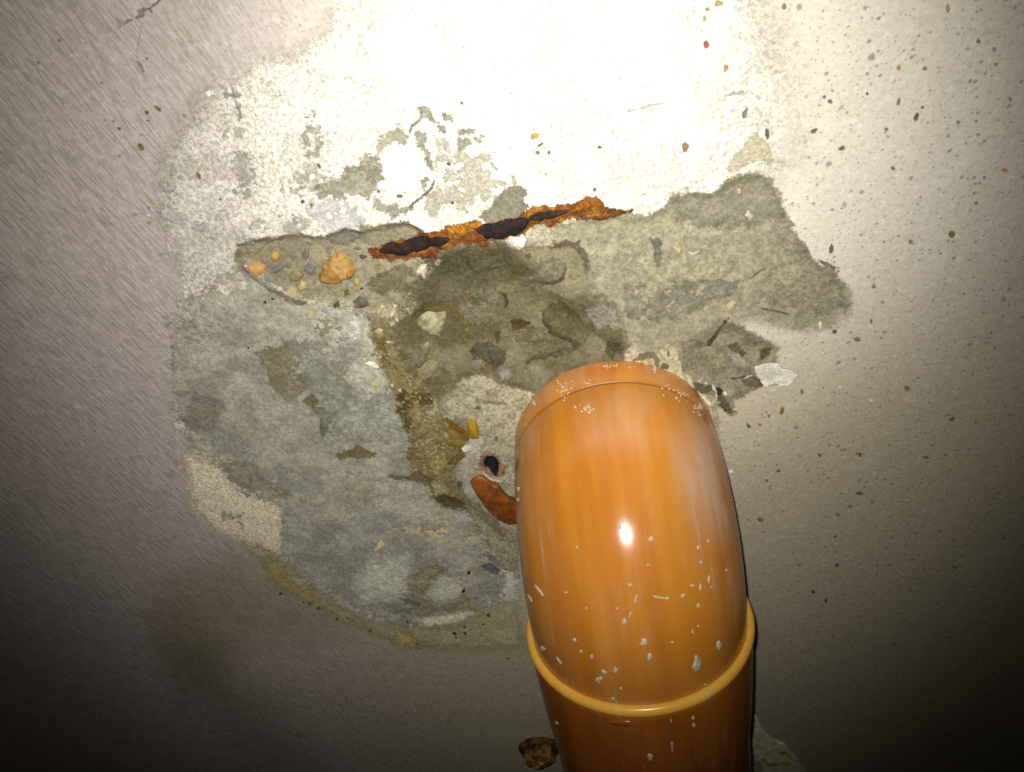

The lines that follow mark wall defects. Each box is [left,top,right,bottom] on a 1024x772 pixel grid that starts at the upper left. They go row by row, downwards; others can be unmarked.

peeling [222,91,261,200]
peeling [134,198,228,239]
rust [368,196,633,262]
spalling [233,106,850,445]